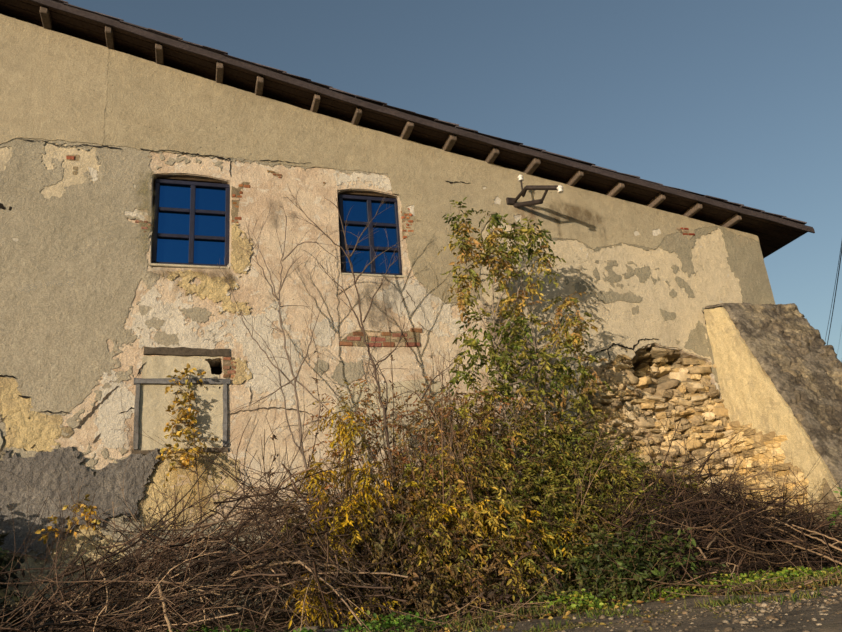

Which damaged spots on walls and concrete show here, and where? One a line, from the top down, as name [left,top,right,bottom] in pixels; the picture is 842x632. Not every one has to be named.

crack [17,138,121,149]
flaking render [0,147,12,171]
flaking render [40,141,101,199]
crack [141,149,232,175]
flaking render [0,151,742,535]
crack [587,338,658,366]
crack [0,375,134,443]